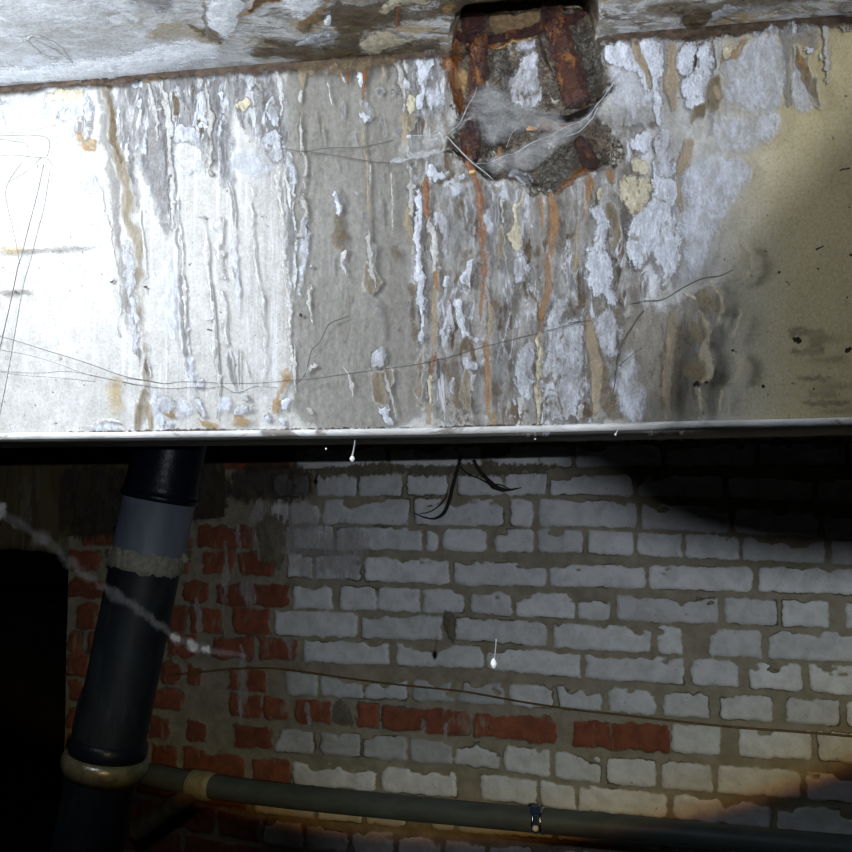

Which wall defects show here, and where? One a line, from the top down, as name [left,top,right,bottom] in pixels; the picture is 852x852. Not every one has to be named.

corrosion [201,2,224,42]
corrosion [236,0,281,19]
damp [0,0,832,434]
corrosion [421,177,438,424]
corrosion [455,9,591,424]
spalling [442,4,625,197]
corrosion [526,118,615,218]
damp [59,462,125,541]